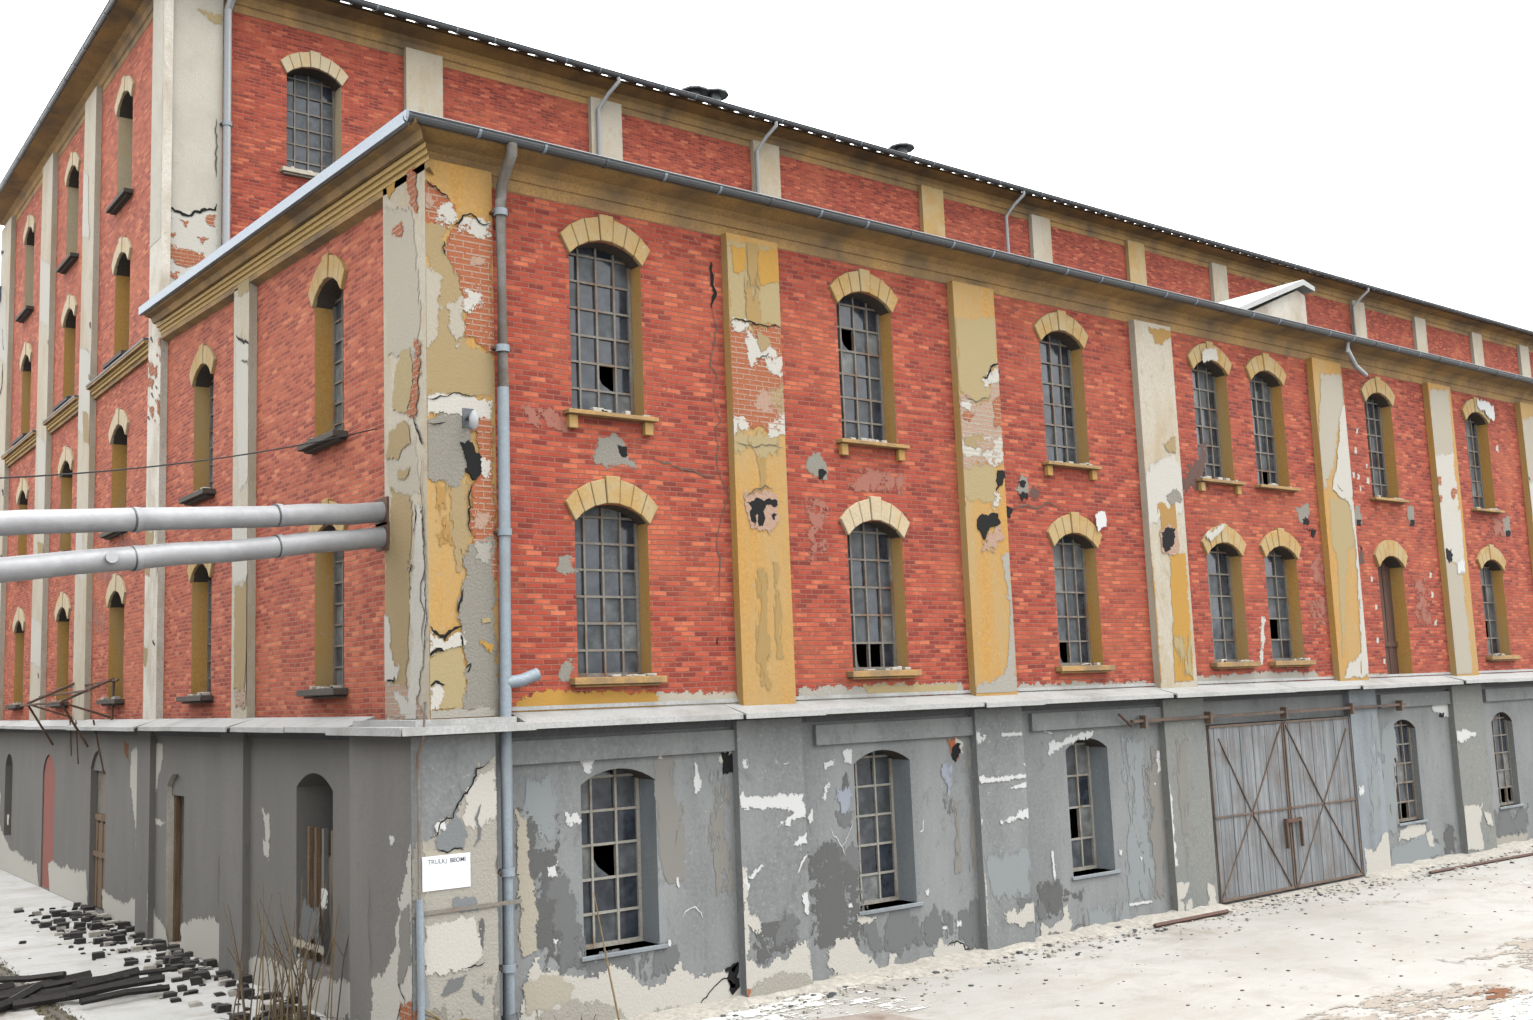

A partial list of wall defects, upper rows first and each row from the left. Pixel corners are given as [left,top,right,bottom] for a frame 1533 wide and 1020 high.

peeling [383,167,500,719]
flaking render [727,240,784,433]
spalling [744,489,779,534]
peeling [955,316,1029,540]
peeling [976,552,1017,693]
peeling [1295,372,1386,679]
spalling [1407,505,1415,526]
peeling [1429,388,1473,674]
peeling [155,743,163,793]
peeling [0,793,219,964]
spalling [249,748,976,1020]